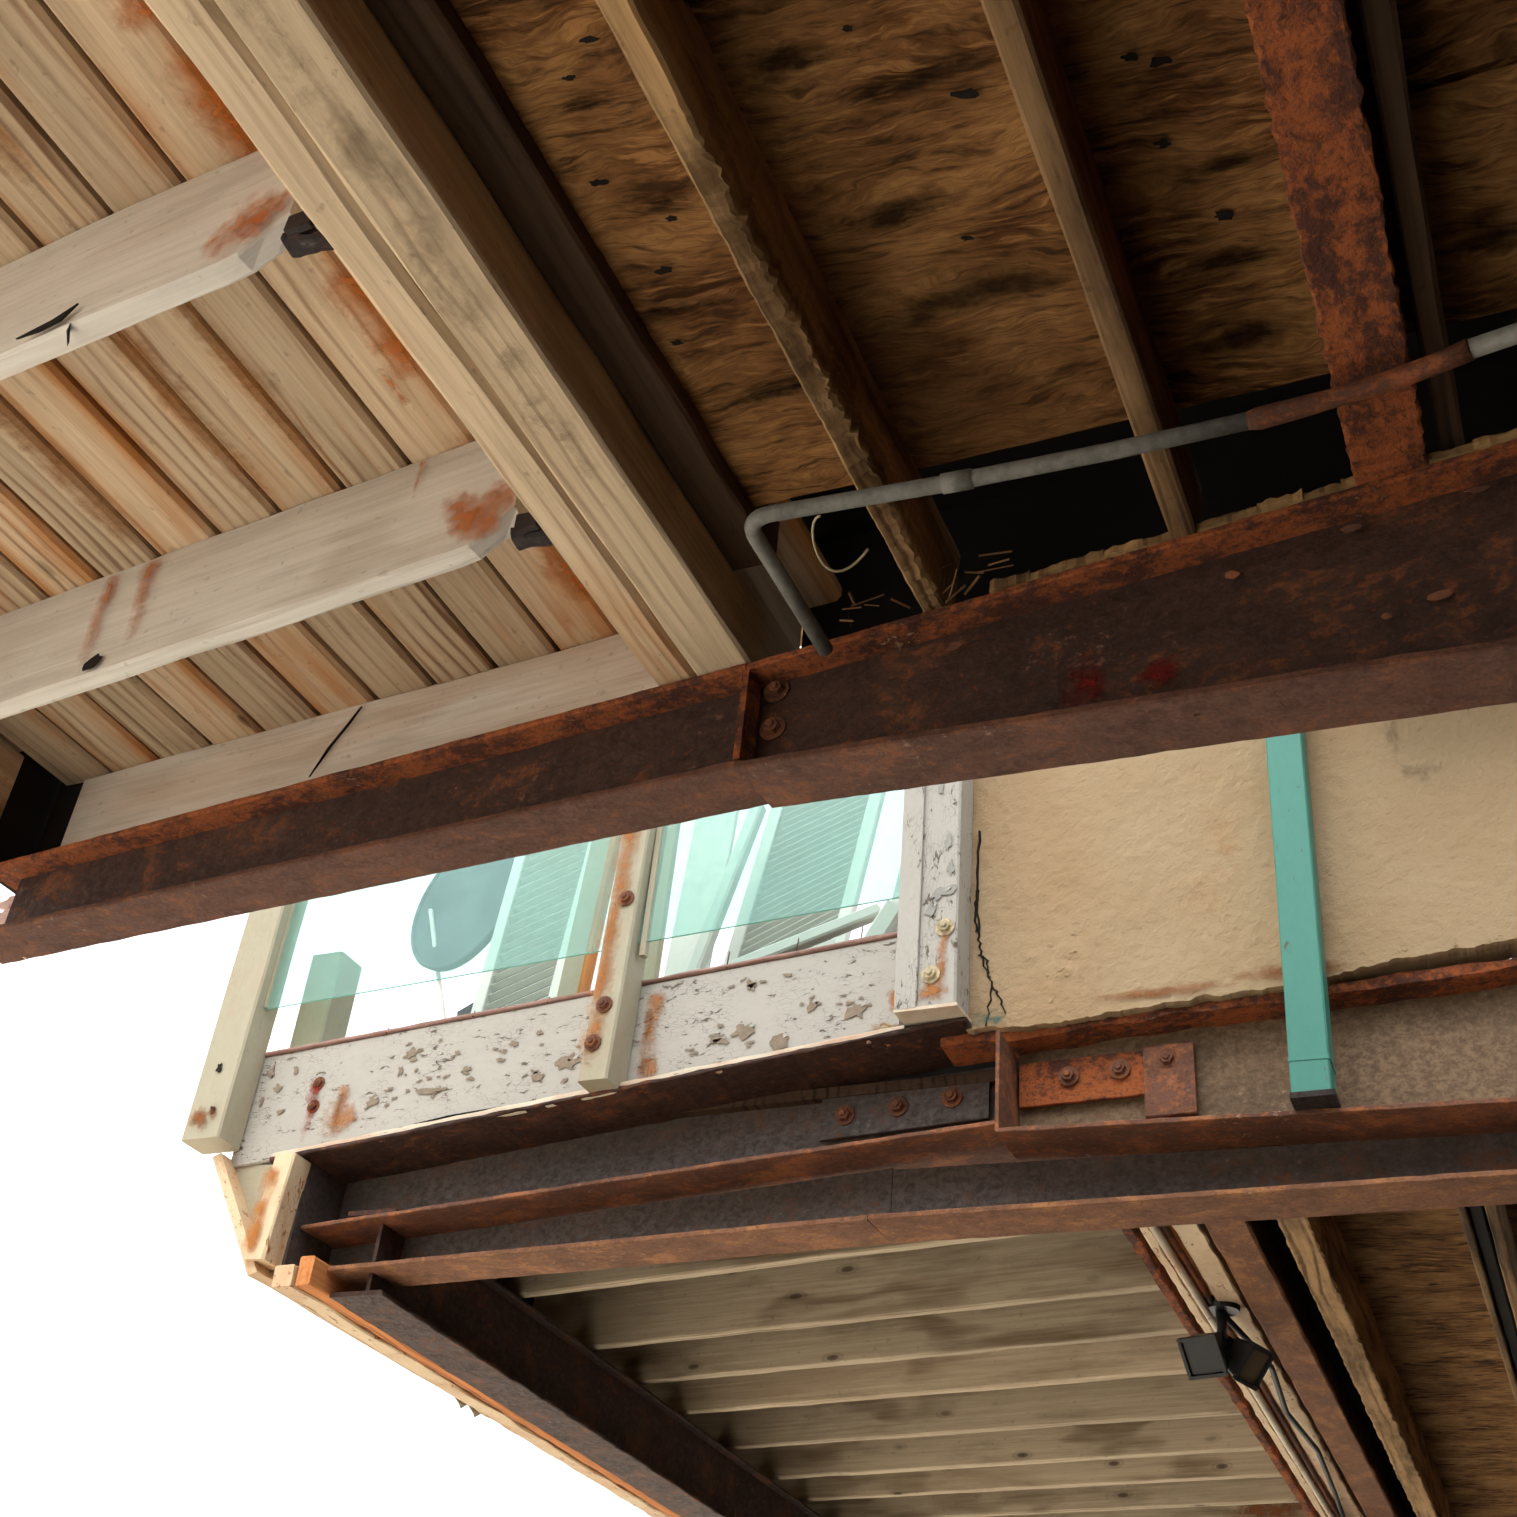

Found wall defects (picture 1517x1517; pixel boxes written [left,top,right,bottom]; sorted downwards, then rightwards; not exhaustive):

rust [335,276,370,301]
crack [15,303,79,340]
rust [377,328,412,402]
rust [548,545,586,594]
rust [594,833,635,998]
peeling [727,972,792,991]
peeling [799,994,872,1019]
rust [639,995,661,1078]
peeling [685,1022,790,1055]
peeling [352,1038,474,1121]
peeling [530,1045,583,1083]
rust [329,1087,352,1132]